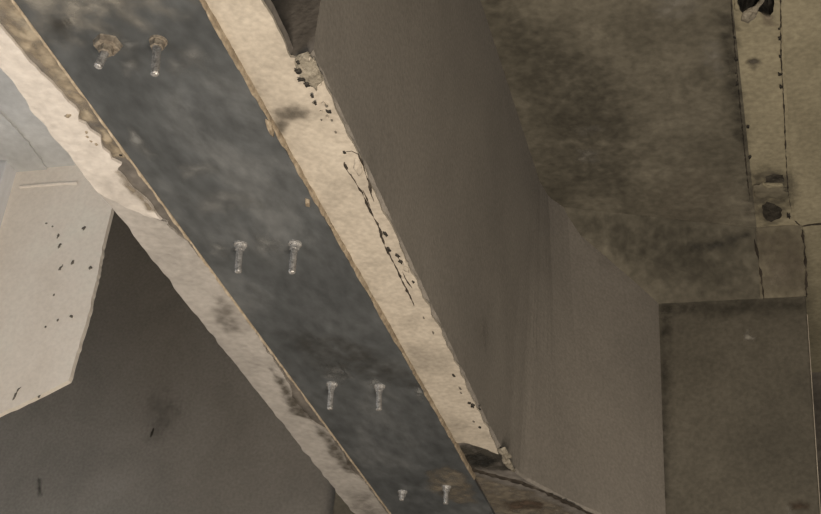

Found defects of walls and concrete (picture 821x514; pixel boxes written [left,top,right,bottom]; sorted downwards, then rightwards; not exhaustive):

spalling [734,0,774,24]
crack [343,151,415,305]